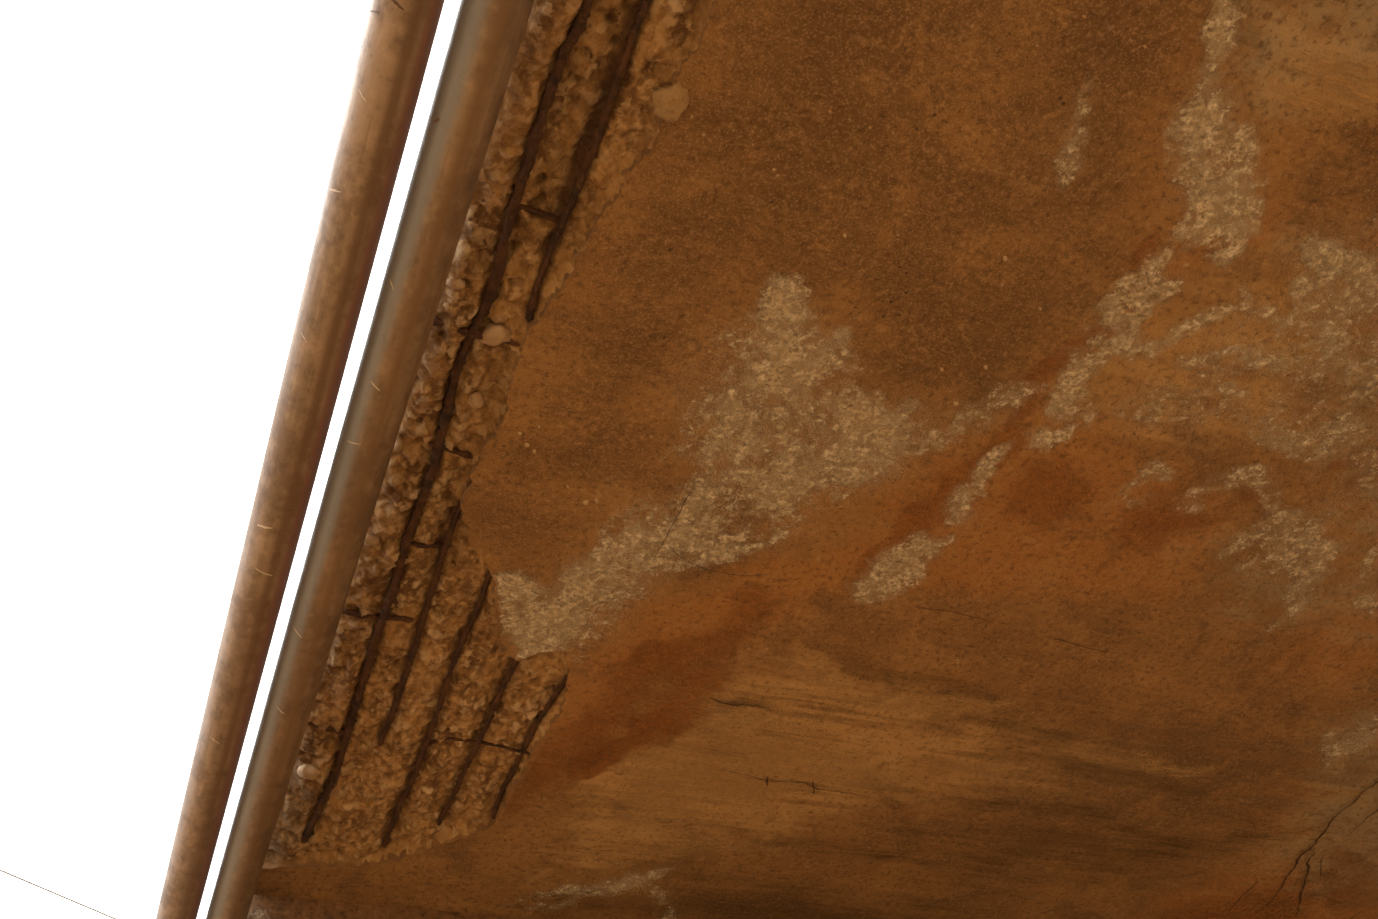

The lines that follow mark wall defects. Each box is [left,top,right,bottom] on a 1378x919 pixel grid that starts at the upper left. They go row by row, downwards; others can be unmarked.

spalling [265,0,714,866]
damp [494,276,1033,659]
damp [1030,0,1378,501]
damp [1219,510,1337,631]
crack [1229,781,1378,917]